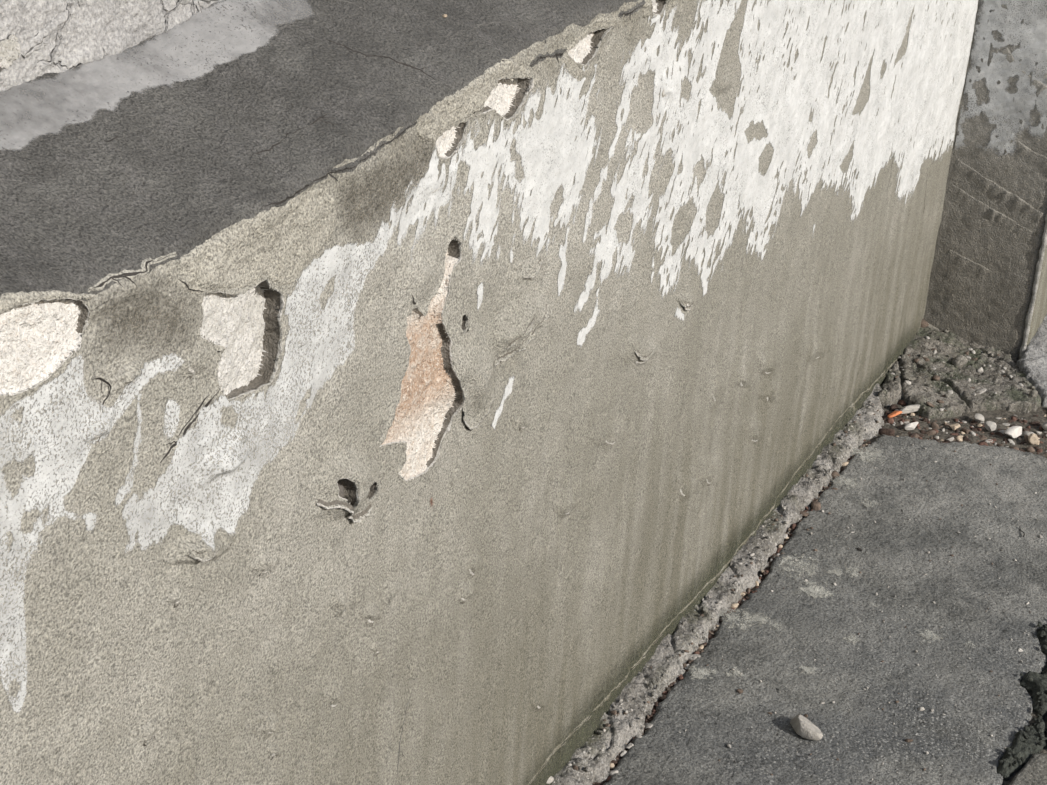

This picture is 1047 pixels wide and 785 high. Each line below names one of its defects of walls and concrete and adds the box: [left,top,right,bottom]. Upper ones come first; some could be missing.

crack [20,0,86,58]
crack [178,0,223,13]
crack [618,0,646,20]
crack [326,38,436,81]
crack [501,48,567,82]
crack [261,120,417,209]
peeling [574,0,1047,346]
crack [87,252,204,310]
peeling [0,16,622,713]